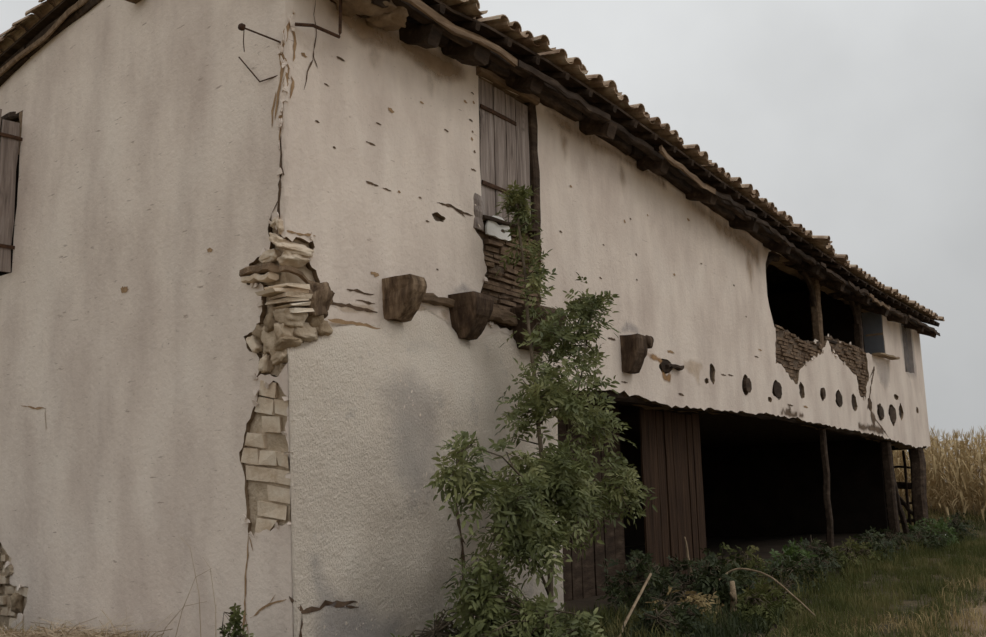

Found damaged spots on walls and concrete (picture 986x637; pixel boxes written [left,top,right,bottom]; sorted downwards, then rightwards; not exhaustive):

spalling [239,217,335,537]
spalling [774,324,868,400]
spalling [0,544,28,632]
crack [242,535,359,637]